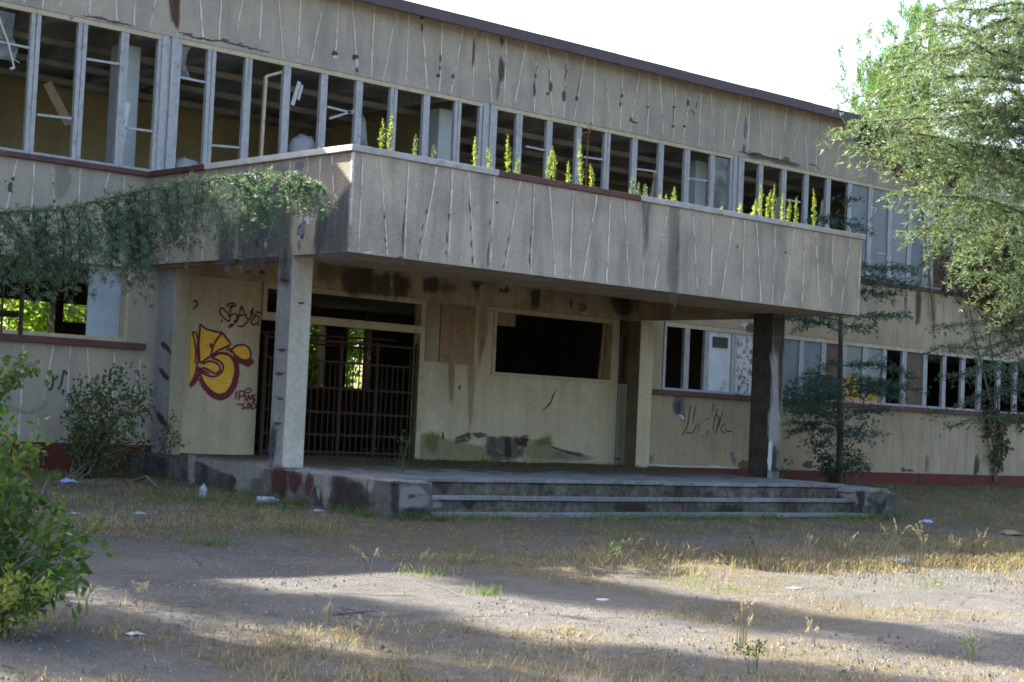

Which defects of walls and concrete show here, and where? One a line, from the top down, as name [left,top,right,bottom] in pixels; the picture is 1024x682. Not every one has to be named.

leakage [342,268,409,296]
peeling [673,396,686,423]